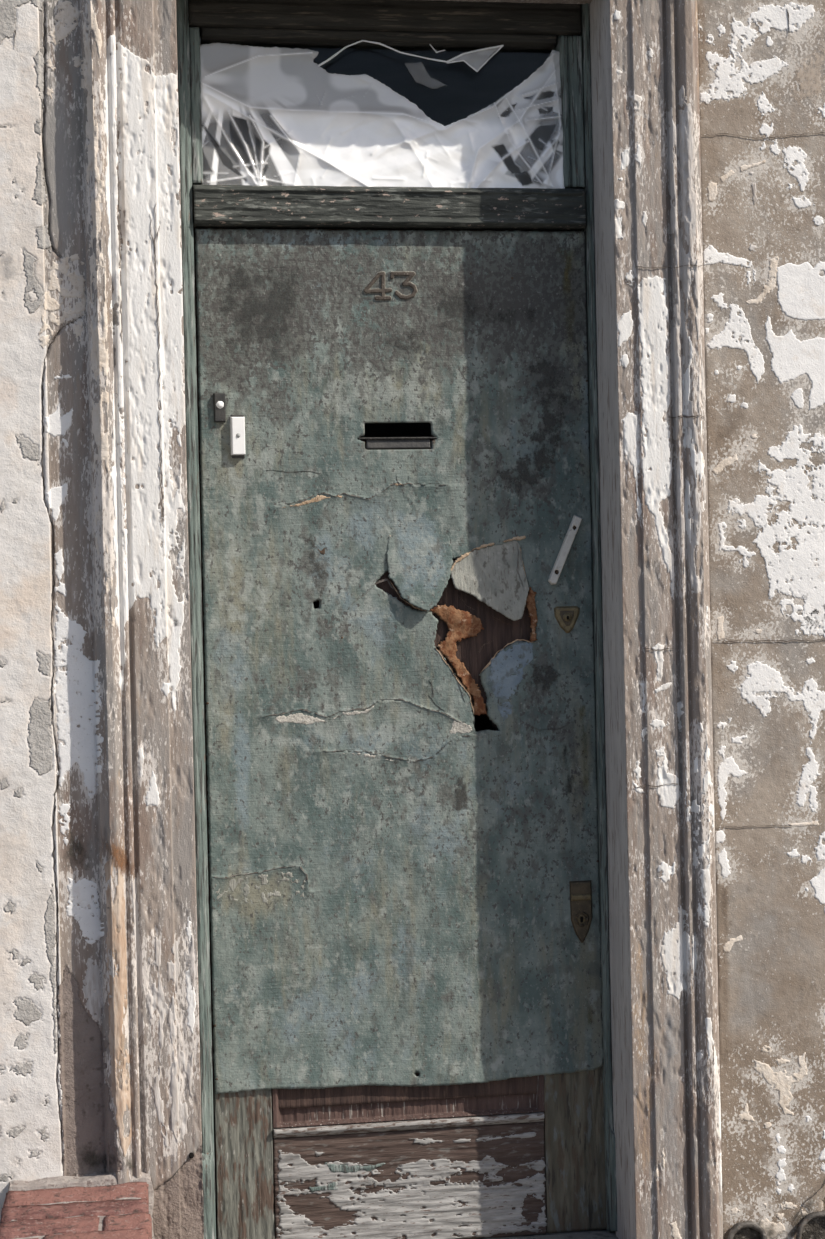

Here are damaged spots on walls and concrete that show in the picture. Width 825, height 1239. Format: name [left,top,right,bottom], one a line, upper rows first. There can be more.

peeling [614,199,625,240]
peeling [617,1,825,599]
peeling [0,0,186,806]
crack [276,470,448,504]
peeling [718,424,825,637]
crack [264,666,475,762]
peeling [449,721,472,734]
peeling [489,642,533,721]
peeling [58,801,71,846]
peeling [633,643,748,1000]
peeling [727,657,825,911]
peeling [276,1132,547,1239]